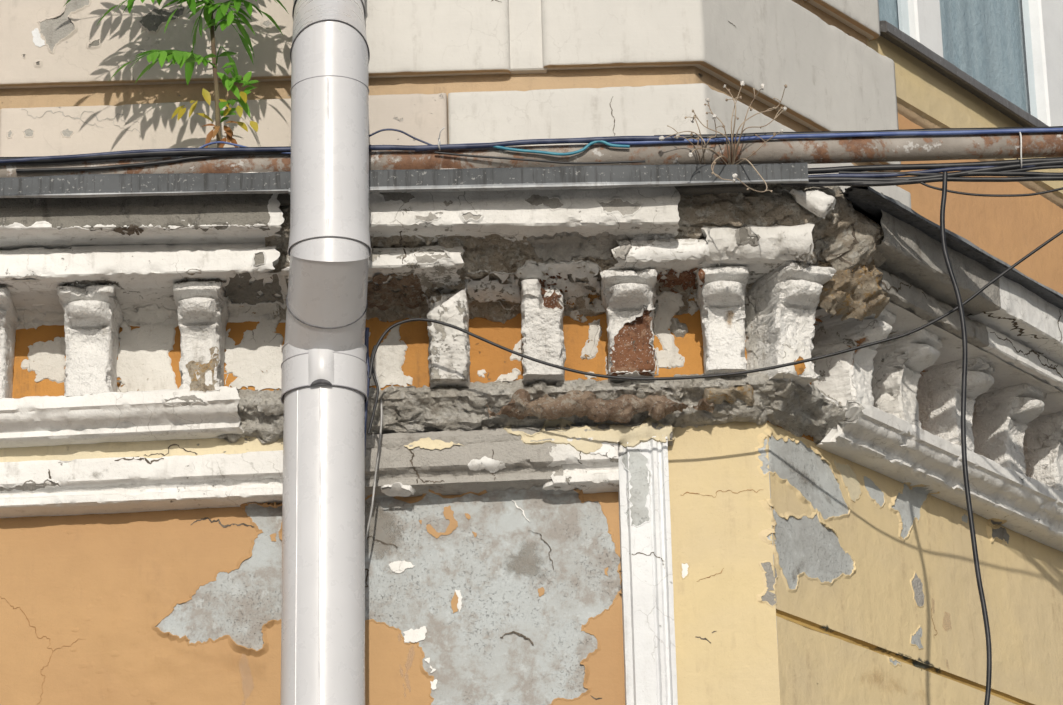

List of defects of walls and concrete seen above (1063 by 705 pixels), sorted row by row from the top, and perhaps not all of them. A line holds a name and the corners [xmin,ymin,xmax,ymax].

flaking render [21,0,92,68]
peeling [373,192,416,204]
peeling [523,193,566,211]
spalling [660,183,890,321]
peeling [0,194,290,444]
crack [983,308,1063,378]
crack [115,444,197,464]
spalling [366,234,939,608]
crack [191,517,254,528]
peeling [151,502,282,657]
peeling [365,482,622,705]
crack [1,598,85,704]